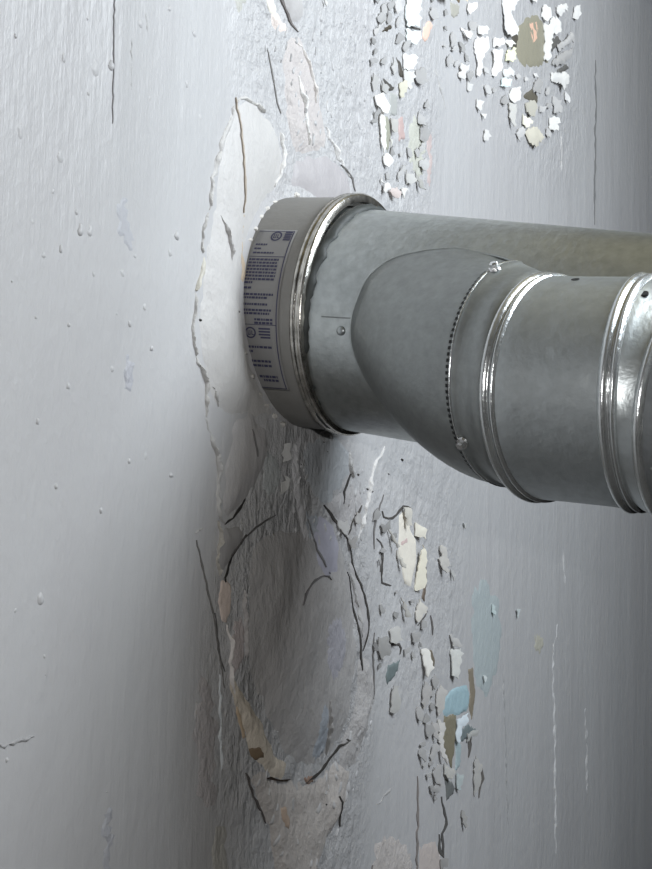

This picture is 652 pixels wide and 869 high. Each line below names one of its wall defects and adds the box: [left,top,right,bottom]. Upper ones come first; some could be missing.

peeling [267,0,276,15]
peeling [370,0,582,199]
crack [196,498,276,688]
crack [303,474,411,699]
peeling [337,507,487,801]
crack [245,740,351,827]
crack [415,776,448,869]